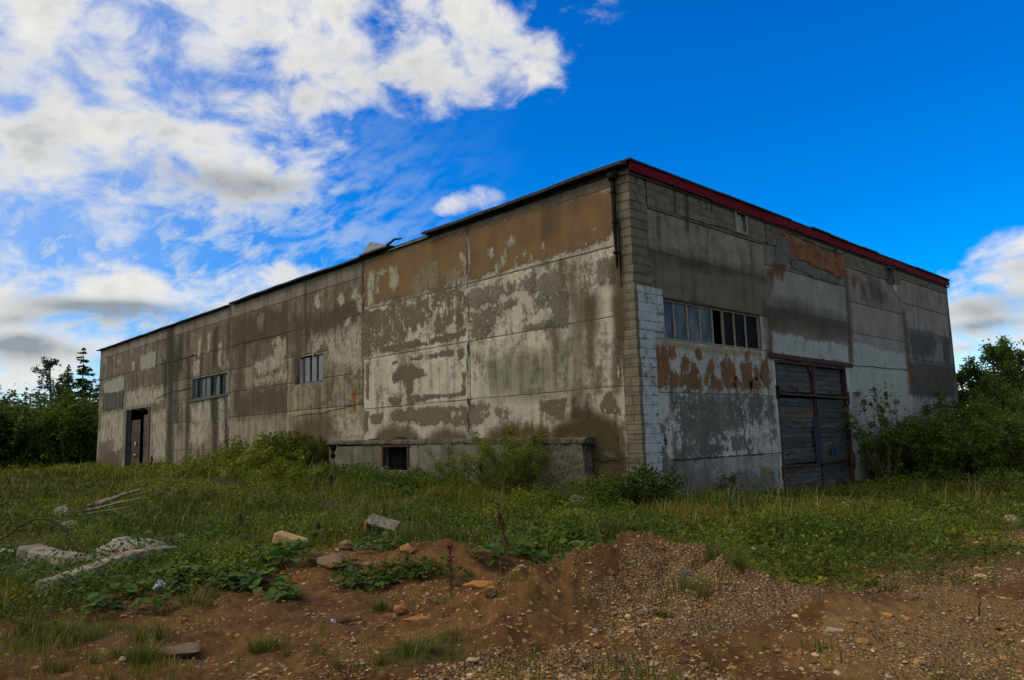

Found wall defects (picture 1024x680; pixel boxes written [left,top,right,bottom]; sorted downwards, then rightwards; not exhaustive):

leakage [163,328,190,463]
peeling [253,336,287,387]
peeling [337,190,617,433]
leakage [551,259,625,485]
peeling [656,345,772,464]
flaking render [765,226,845,285]